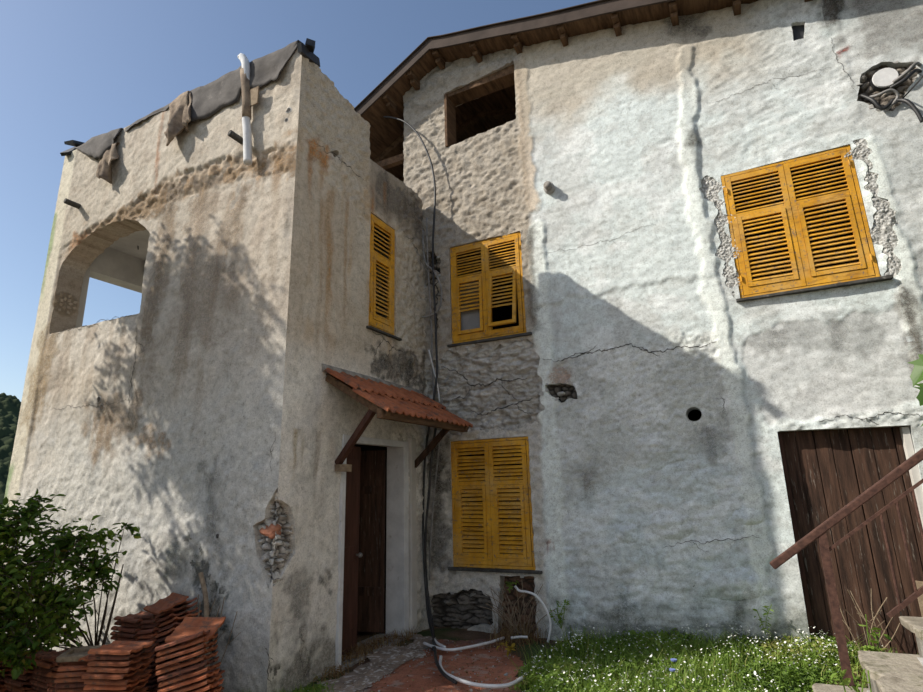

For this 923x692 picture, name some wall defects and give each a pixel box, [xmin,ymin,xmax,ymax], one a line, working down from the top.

flaking render [699,176,740,298]
flaking render [844,138,902,277]
crack [543,342,714,362]
spalling [258,496,293,582]
flaking render [431,574,537,632]